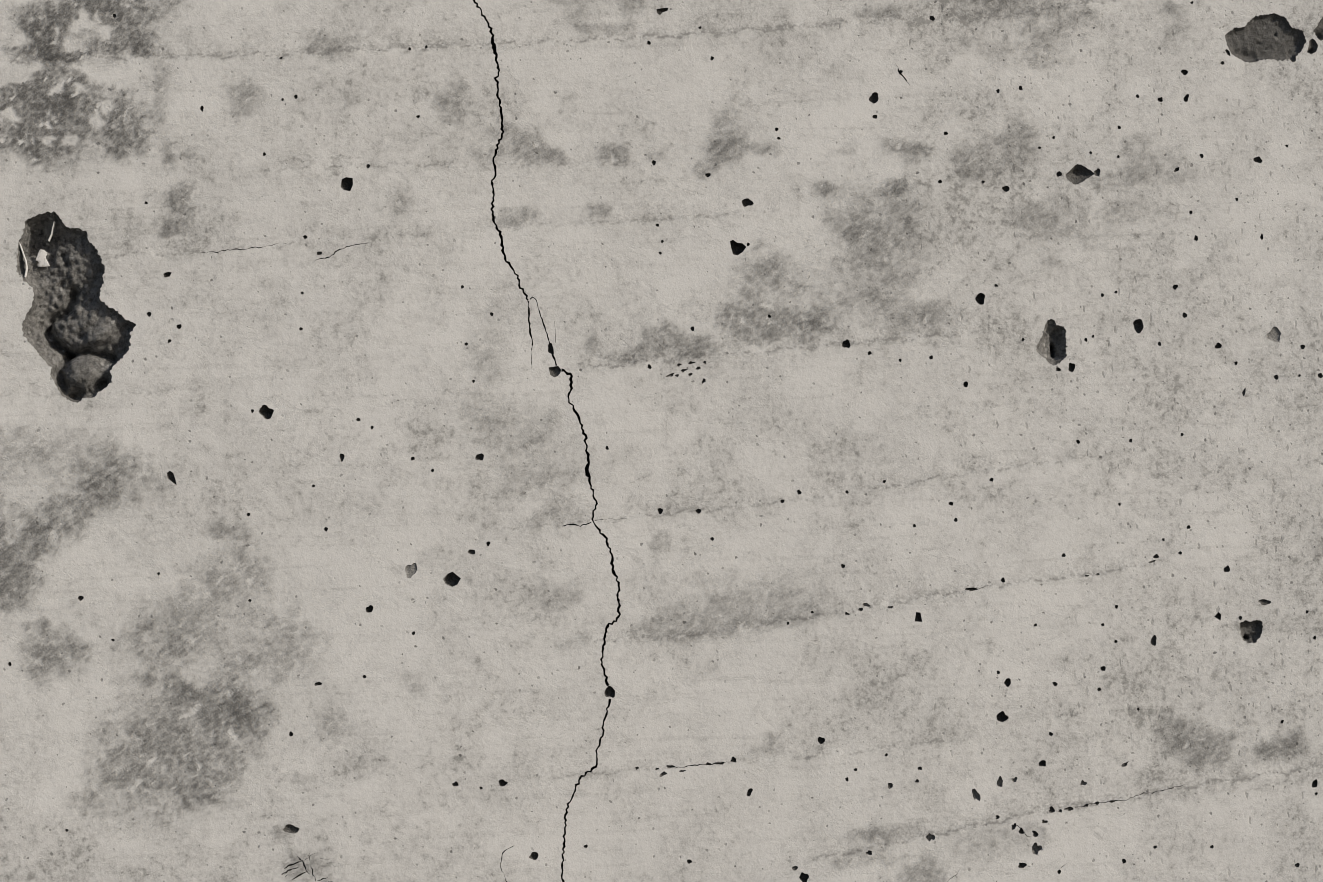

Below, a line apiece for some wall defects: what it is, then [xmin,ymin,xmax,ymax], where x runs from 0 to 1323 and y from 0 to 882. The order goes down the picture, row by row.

spalling [1225,13,1323,63]
spalling [16,211,136,403]
crack [473,0,627,882]
spalling [1036,319,1075,372]